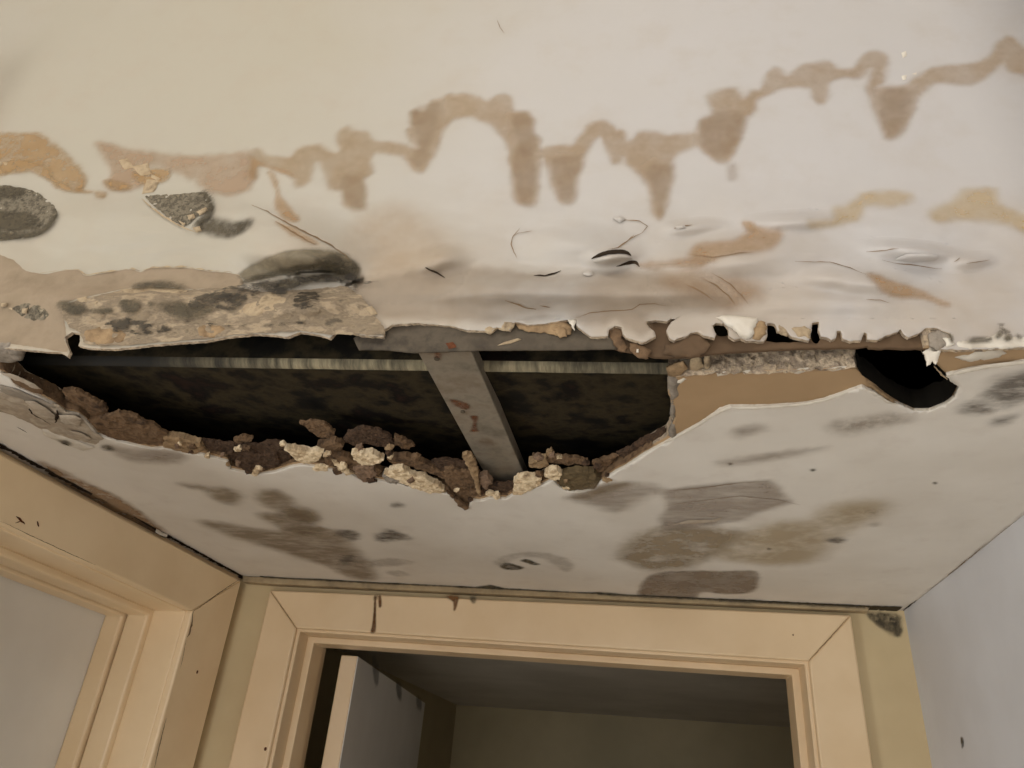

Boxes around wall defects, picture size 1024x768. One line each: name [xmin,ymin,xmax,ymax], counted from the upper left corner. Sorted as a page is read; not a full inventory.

spalling [143,191,251,237]
spalling [0,255,385,451]
mould [58,249,371,334]
rust [451,400,478,432]
peeling [484,319,576,346]
peeling [609,315,867,444]
peeling [922,324,1024,377]
water stain [209,492,529,591]
water stain [577,481,902,636]
rust [371,595,381,633]